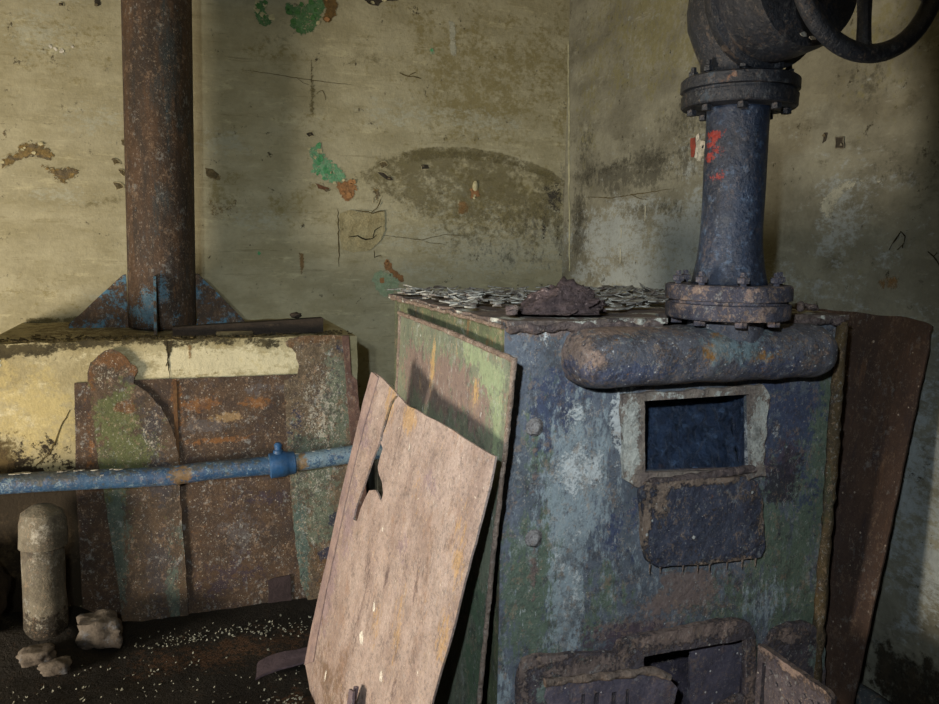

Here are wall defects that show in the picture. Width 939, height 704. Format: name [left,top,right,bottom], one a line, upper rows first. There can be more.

peeling [285,0,325,35]
flaking render [0,140,79,183]
peeling [306,132,357,202]
crack [337,199,467,264]
damp [875,641,939,704]